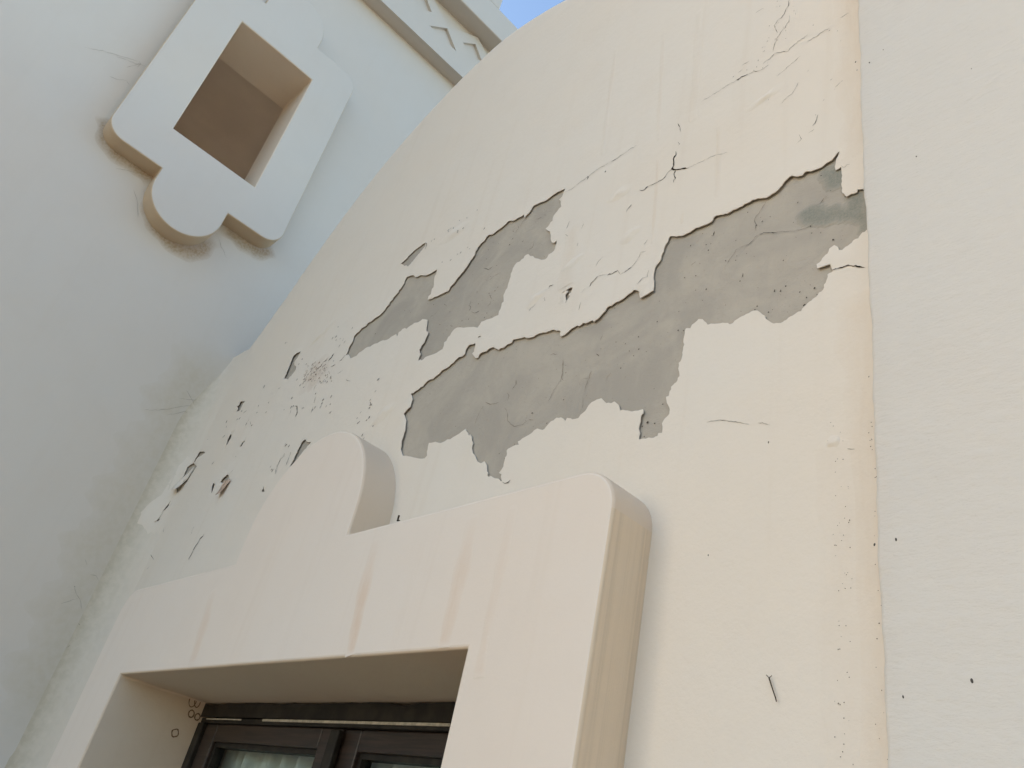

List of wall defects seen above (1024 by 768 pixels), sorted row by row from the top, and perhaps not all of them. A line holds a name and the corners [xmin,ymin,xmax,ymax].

crack [706,1,848,103]
crack [626,124,727,212]
peeling [336,153,867,481]
peeling [285,352,332,413]
peeling [171,439,213,492]
peeling [285,440,311,463]